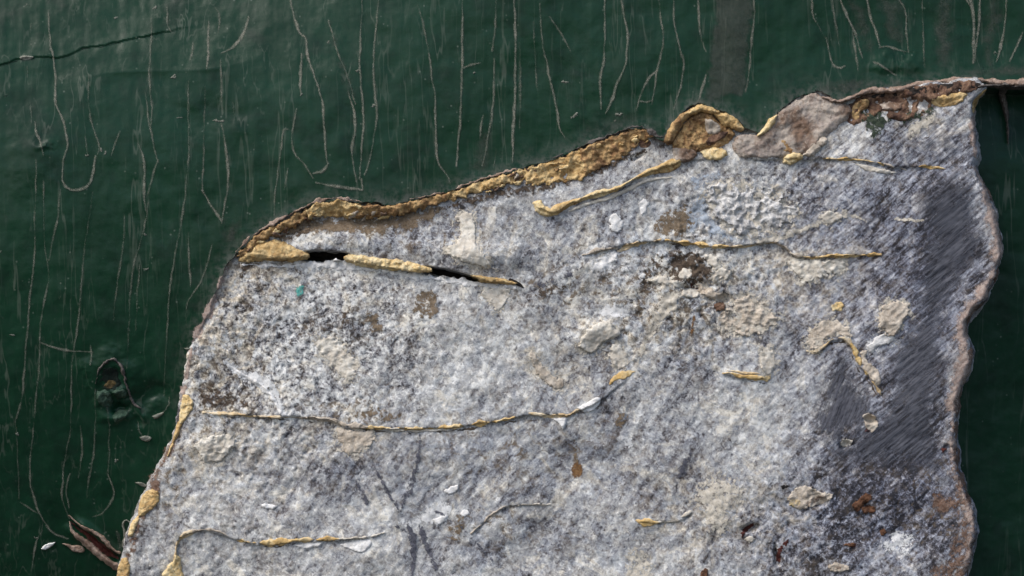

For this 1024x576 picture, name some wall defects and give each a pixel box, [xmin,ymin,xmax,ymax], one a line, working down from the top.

crack [4,55,33,64]
crack [241,252,524,290]
spalling [117,76,1024,576]